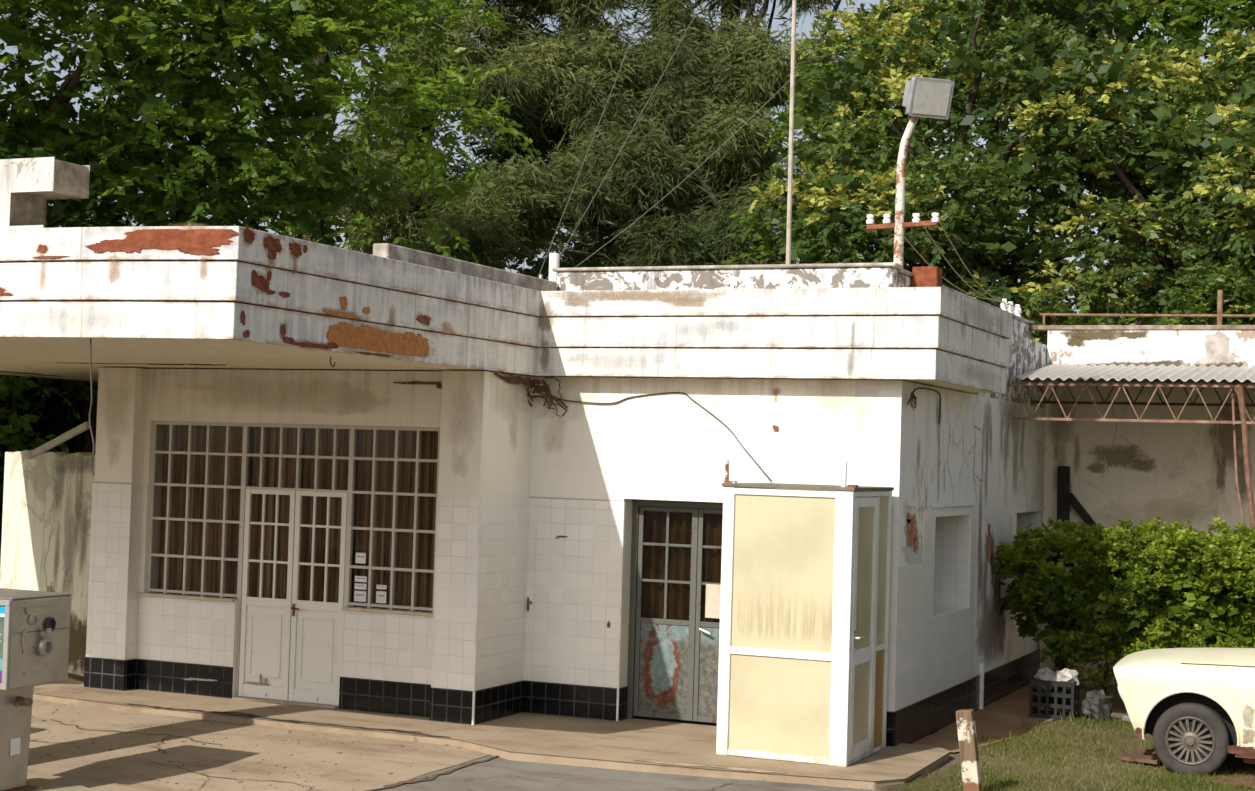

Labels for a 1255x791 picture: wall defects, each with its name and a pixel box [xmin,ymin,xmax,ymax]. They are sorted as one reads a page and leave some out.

rust [34,244,67,284]
rust [86,227,308,298]
crack [906,391,983,512]
flaking render [903,512,923,565]
damp [978,493,1006,656]